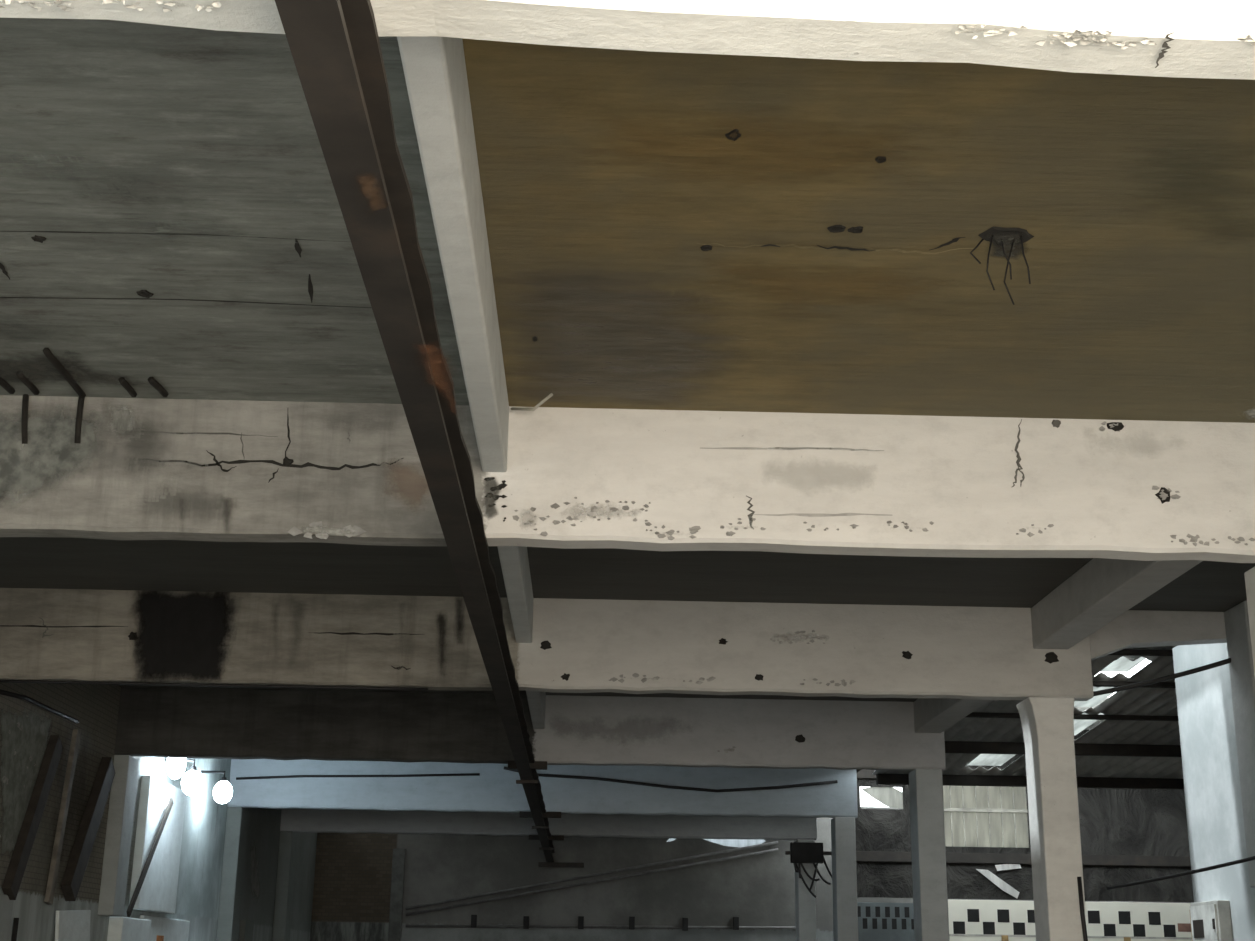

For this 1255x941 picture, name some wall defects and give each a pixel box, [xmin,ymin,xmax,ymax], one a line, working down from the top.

spalling [970,227,1034,305]
spalling [0,348,169,500]
crack [137,415,403,483]
crack [1012,419,1025,487]